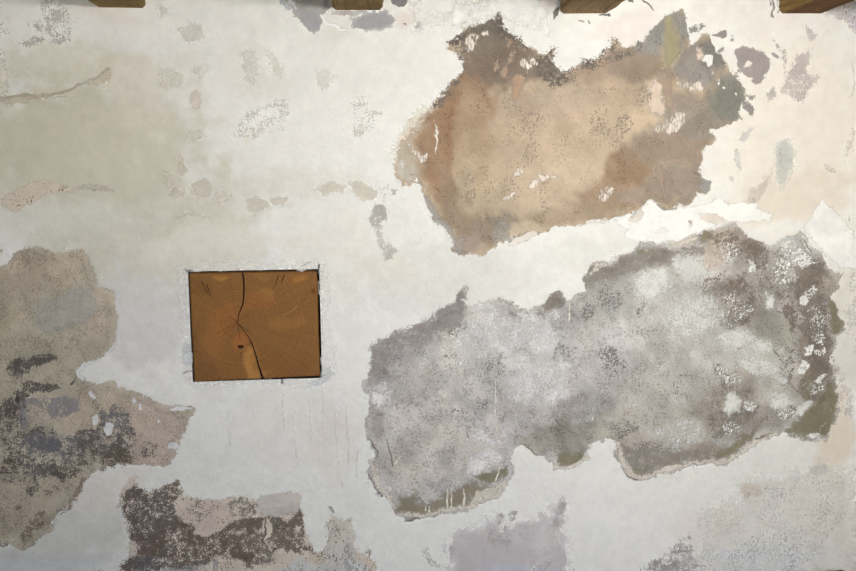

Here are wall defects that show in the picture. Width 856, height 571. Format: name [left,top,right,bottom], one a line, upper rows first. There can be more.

peeling [280,0,421,34]
crack [0,67,111,104]
flaking render [0,246,195,551]
peeling [119,479,377,571]